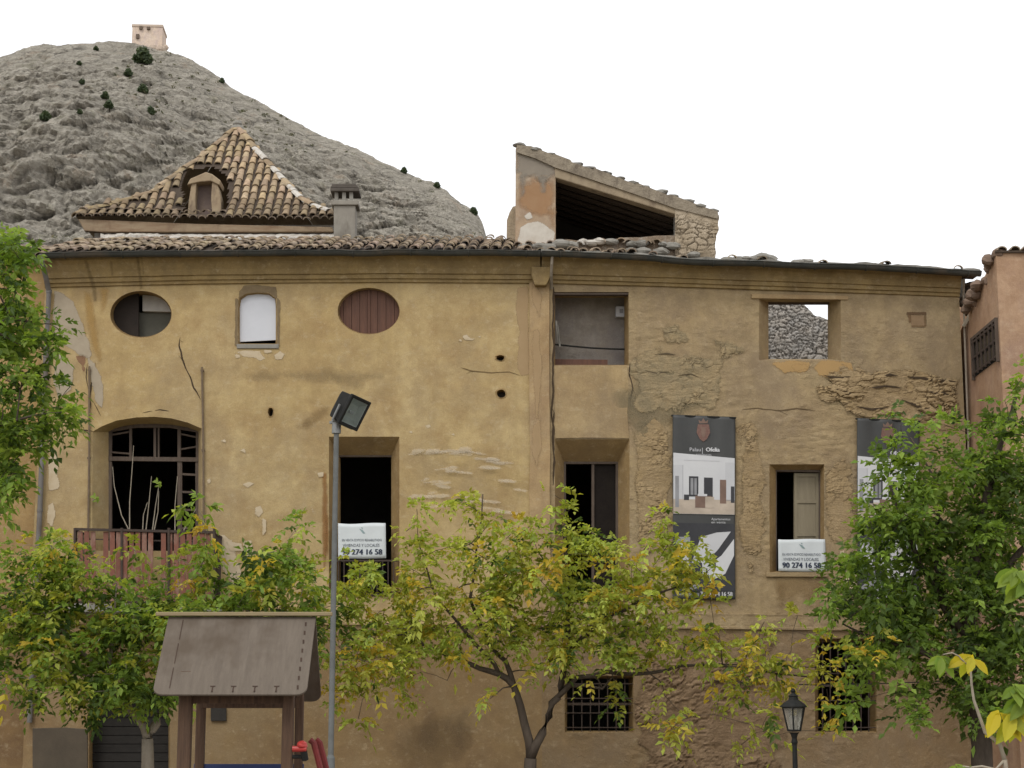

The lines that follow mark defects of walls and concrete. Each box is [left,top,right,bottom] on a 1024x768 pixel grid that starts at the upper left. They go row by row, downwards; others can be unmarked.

flaking render [53,291,103,408]
crack [178,339,201,400]
spalling [235,285,285,361]